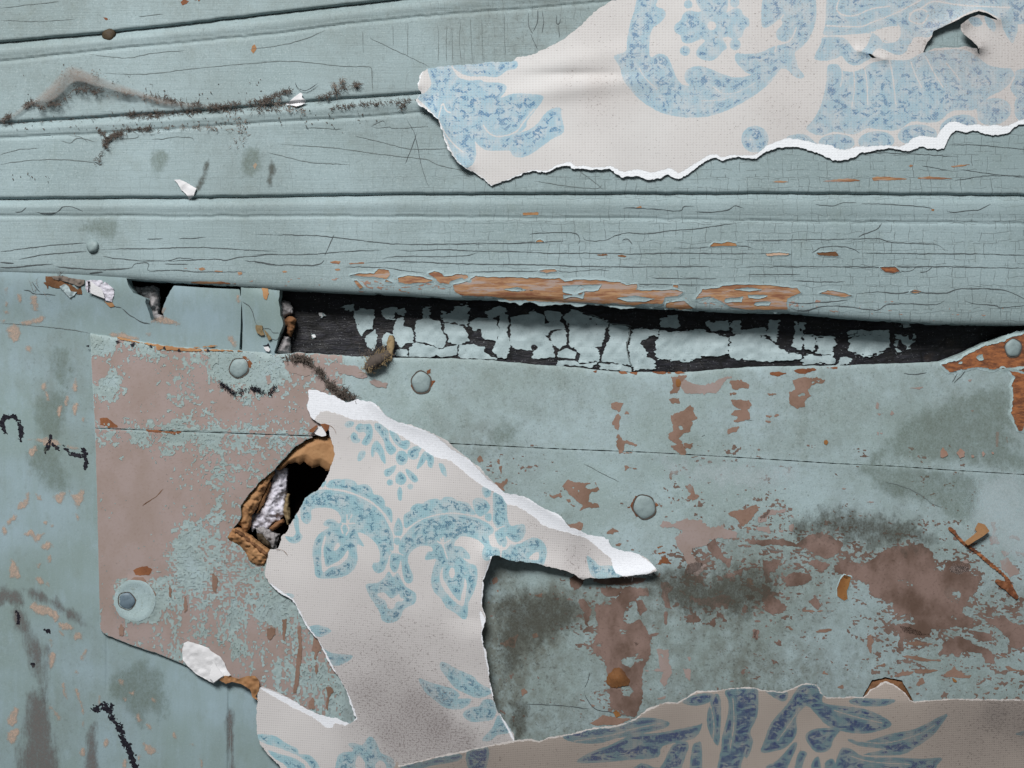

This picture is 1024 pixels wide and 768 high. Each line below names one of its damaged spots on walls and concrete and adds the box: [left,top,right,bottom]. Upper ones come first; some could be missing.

crack [272,120,502,188]
peeling [825,165,913,182]
crack [1,202,1024,311]
crack [592,315,632,365]
peeling [55,300,388,720]
peeling [331,261,1024,726]
damp [797,514,921,541]
peeling [30,603,81,640]